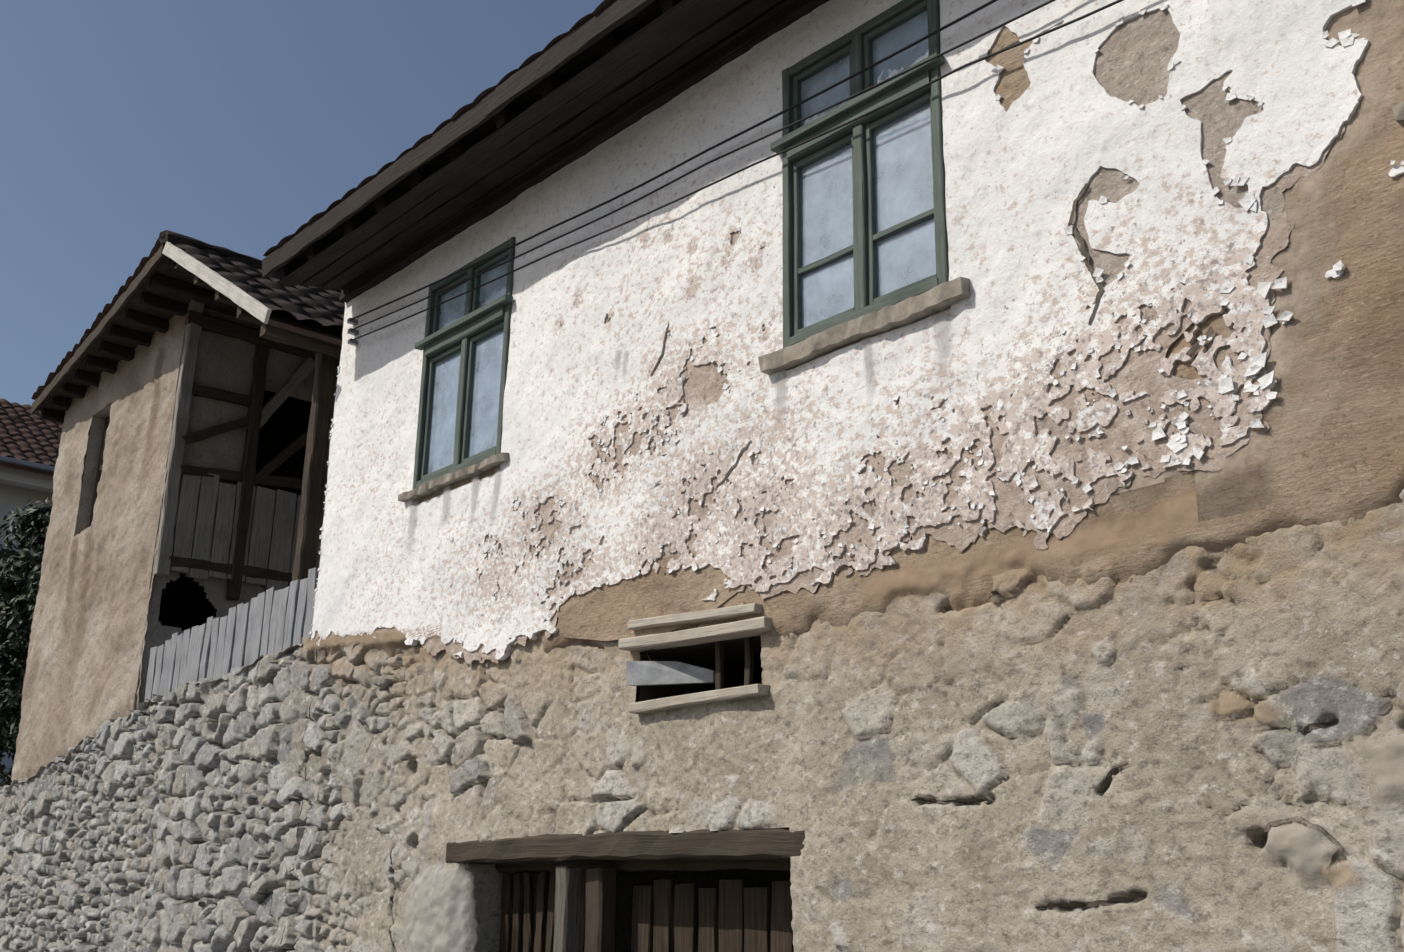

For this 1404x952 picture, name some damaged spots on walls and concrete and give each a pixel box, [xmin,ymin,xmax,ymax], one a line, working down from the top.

crack [1067,183,1104,325]
peeling [423,0,1390,664]
peeling [309,484,358,650]
crack [911,797,995,805]
crack [1097,763,1128,794]
crack [1035,893,1146,910]